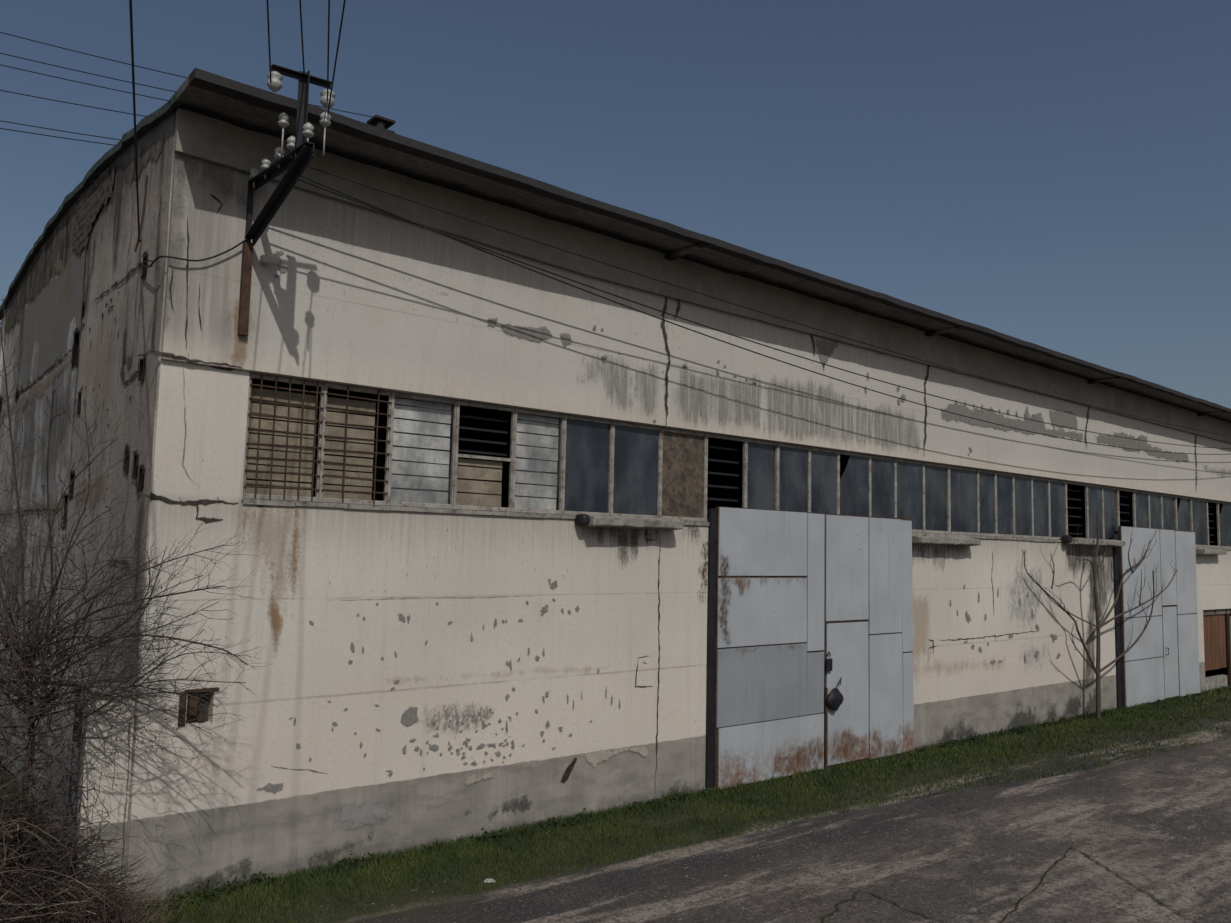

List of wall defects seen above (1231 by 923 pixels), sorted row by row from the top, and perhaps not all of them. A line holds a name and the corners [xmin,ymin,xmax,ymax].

spalling [22,165,115,304]
spalling [71,303,91,370]
crack [0,219,242,524]
peeling [487,318,572,346]
crack [661,297,680,433]
damp [0,213,105,613]
peeling [941,400,1189,463]
rust [270,599,282,642]
peeling [526,579,580,616]
damp [1009,546,1113,727]
peeling [401,703,525,785]
peeling [258,783,283,794]